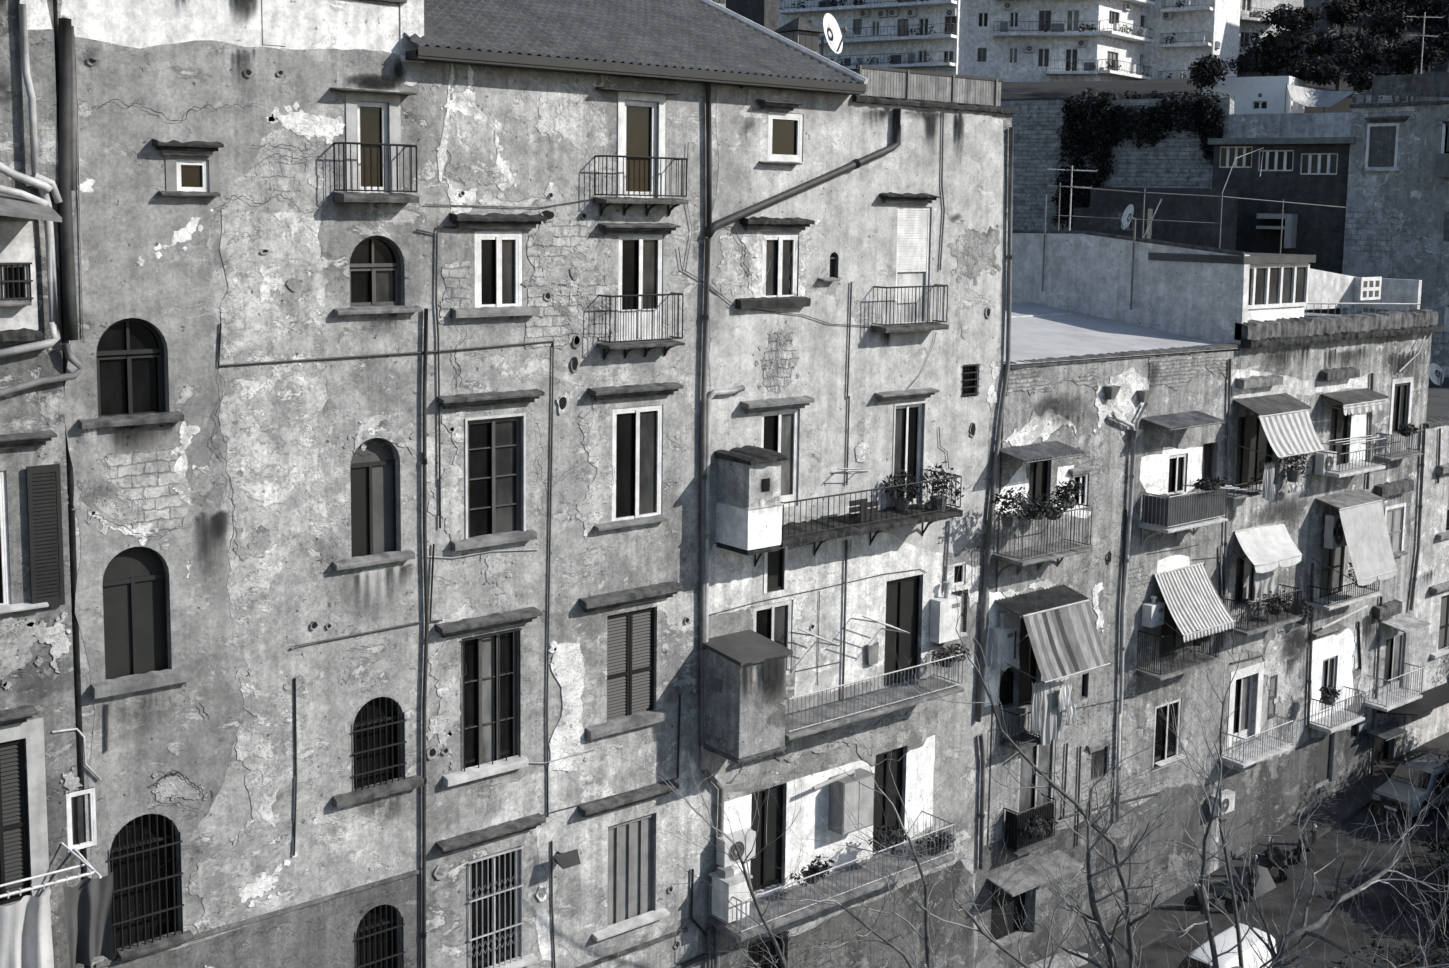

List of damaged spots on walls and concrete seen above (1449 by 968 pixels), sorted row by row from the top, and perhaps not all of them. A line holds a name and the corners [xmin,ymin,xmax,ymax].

peeling [77,175,95,193]
peeling [265,101,345,144]
peeling [402,63,517,214]
peeling [67,204,328,618]
spalling [986,352,1234,446]
leakage [201,511,228,569]
spalling [0,612,72,691]
peeling [548,640,588,773]